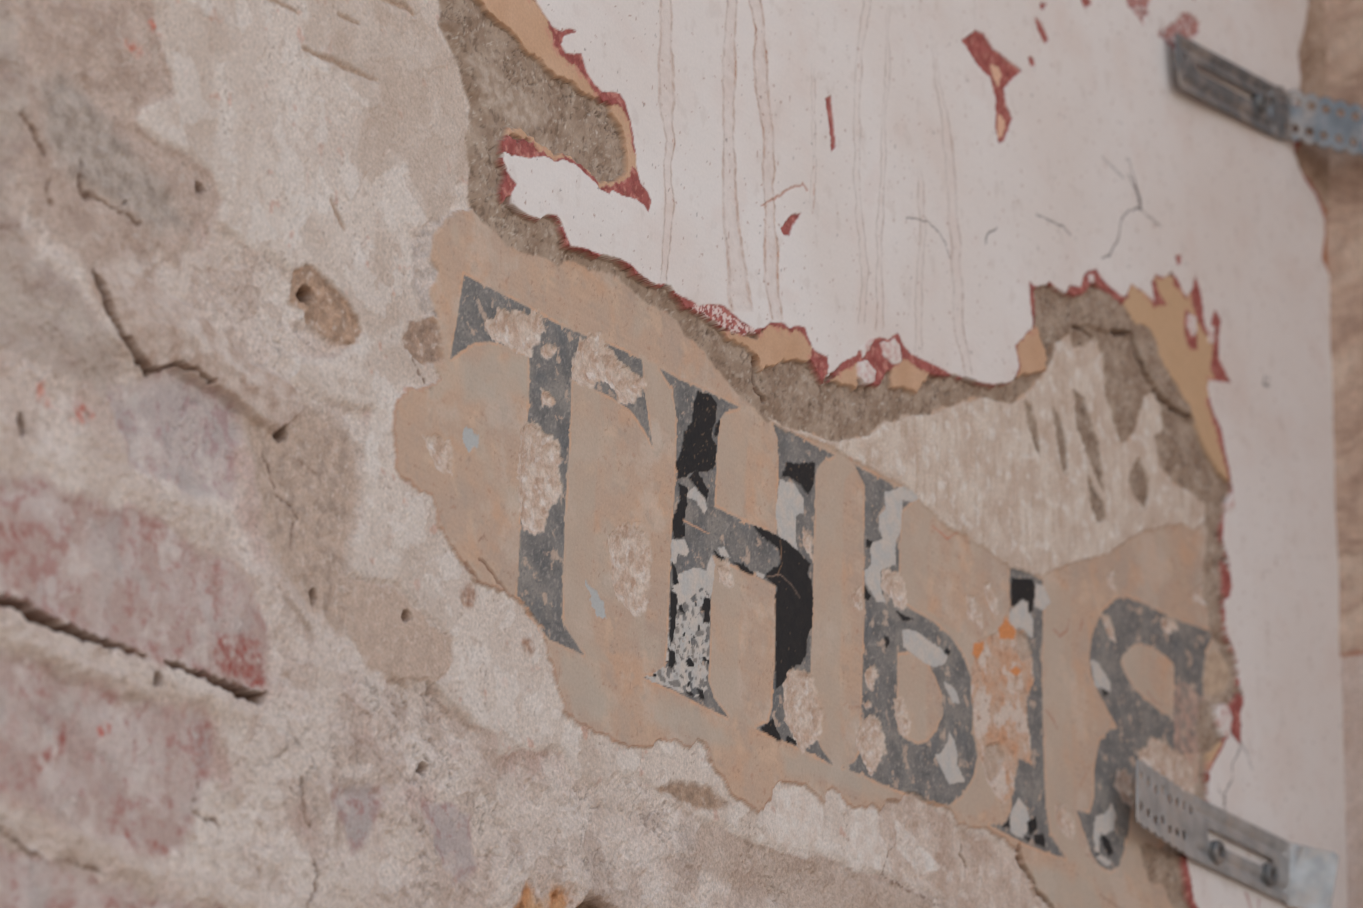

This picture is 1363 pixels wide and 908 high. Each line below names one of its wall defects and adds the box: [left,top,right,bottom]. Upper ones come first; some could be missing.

crack [92,269,217,383]
spalling [289,263,363,344]
spalling [402,213,447,364]
spalling [422,426,480,475]
spalling [438,0,1245,814]
crack [0,595,267,703]